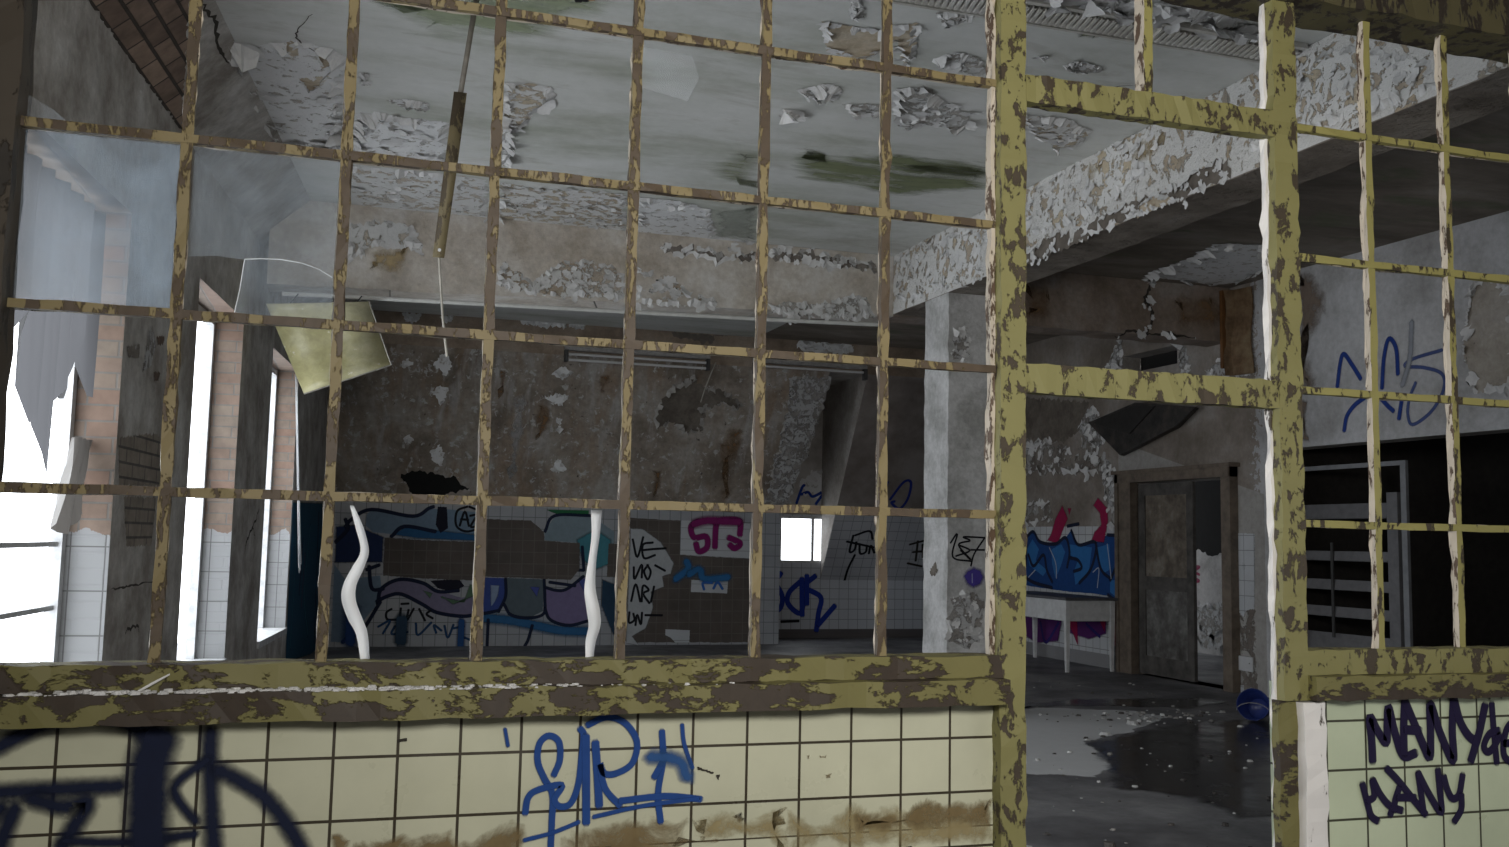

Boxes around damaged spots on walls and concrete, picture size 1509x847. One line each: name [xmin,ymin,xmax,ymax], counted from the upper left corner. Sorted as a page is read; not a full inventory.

crack [203,4,229,63]
peeling [816,0,986,77]
peeling [779,84,978,135]
peeling [1295,44,1436,137]
peeling [228,39,877,274]
mould [800,153,986,194]
peeling [1025,114,1231,266]
peeling [496,259,717,313]
peeling [1141,243,1263,286]
peeling [1460,281,1509,398]
flaking render [653,375,743,436]
peeling [1025,396,1116,531]